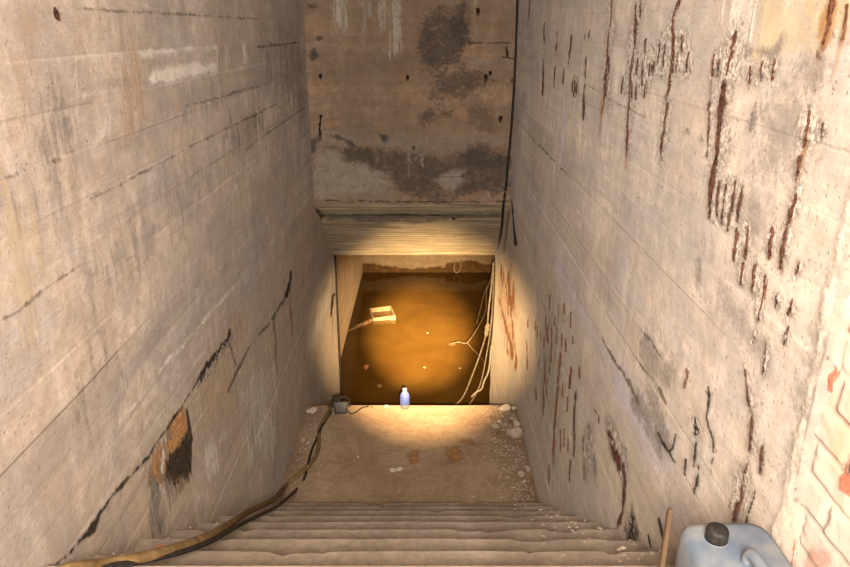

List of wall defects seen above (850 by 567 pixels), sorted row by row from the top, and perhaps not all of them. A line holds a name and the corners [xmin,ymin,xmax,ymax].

water stain [417,0,477,70]
water stain [311,134,512,218]
rust [499,266,517,371]
crack [657,98,829,523]
spalling [814,198,850,395]
crack [56,270,293,564]
rust [548,375,579,483]
spalling [771,376,815,547]
peeling [839,464,850,496]